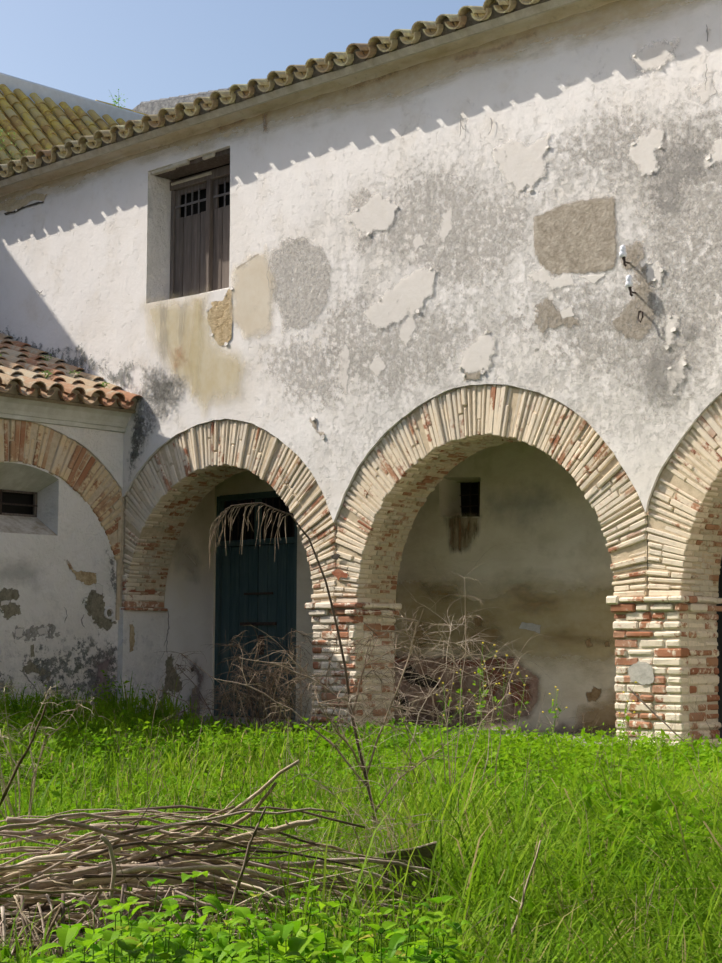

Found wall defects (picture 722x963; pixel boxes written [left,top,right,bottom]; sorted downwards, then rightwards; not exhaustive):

peeling [267,79,722,406]
spalling [206,287,233,346]
damp [0,302,239,472]
spalling [0,587,62,684]
spalling [64,559,117,631]
peeling [394,655,539,724]